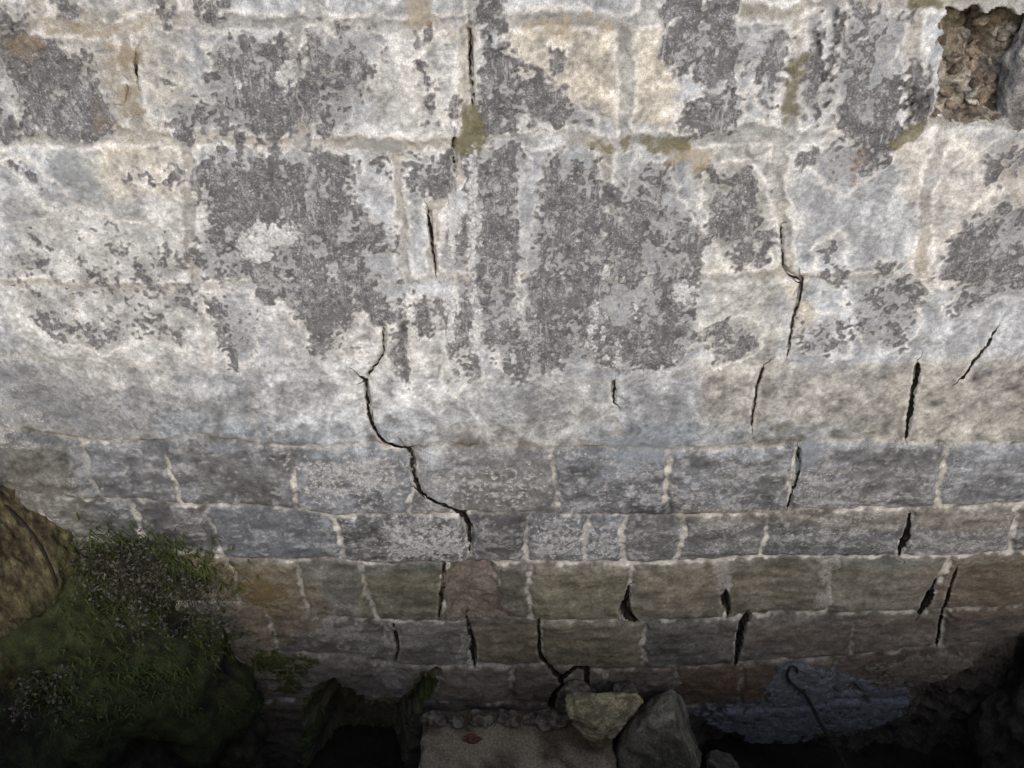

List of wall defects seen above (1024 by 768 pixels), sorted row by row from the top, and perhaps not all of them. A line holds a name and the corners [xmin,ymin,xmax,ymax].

peeling [653,0,1024,183]
crack [424,199,440,282]
crack [751,221,804,434]
crack [952,324,1000,386]
crack [349,305,472,554]
crack [436,560,446,622]
crack [935,564,960,646]
crack [537,614,589,710]